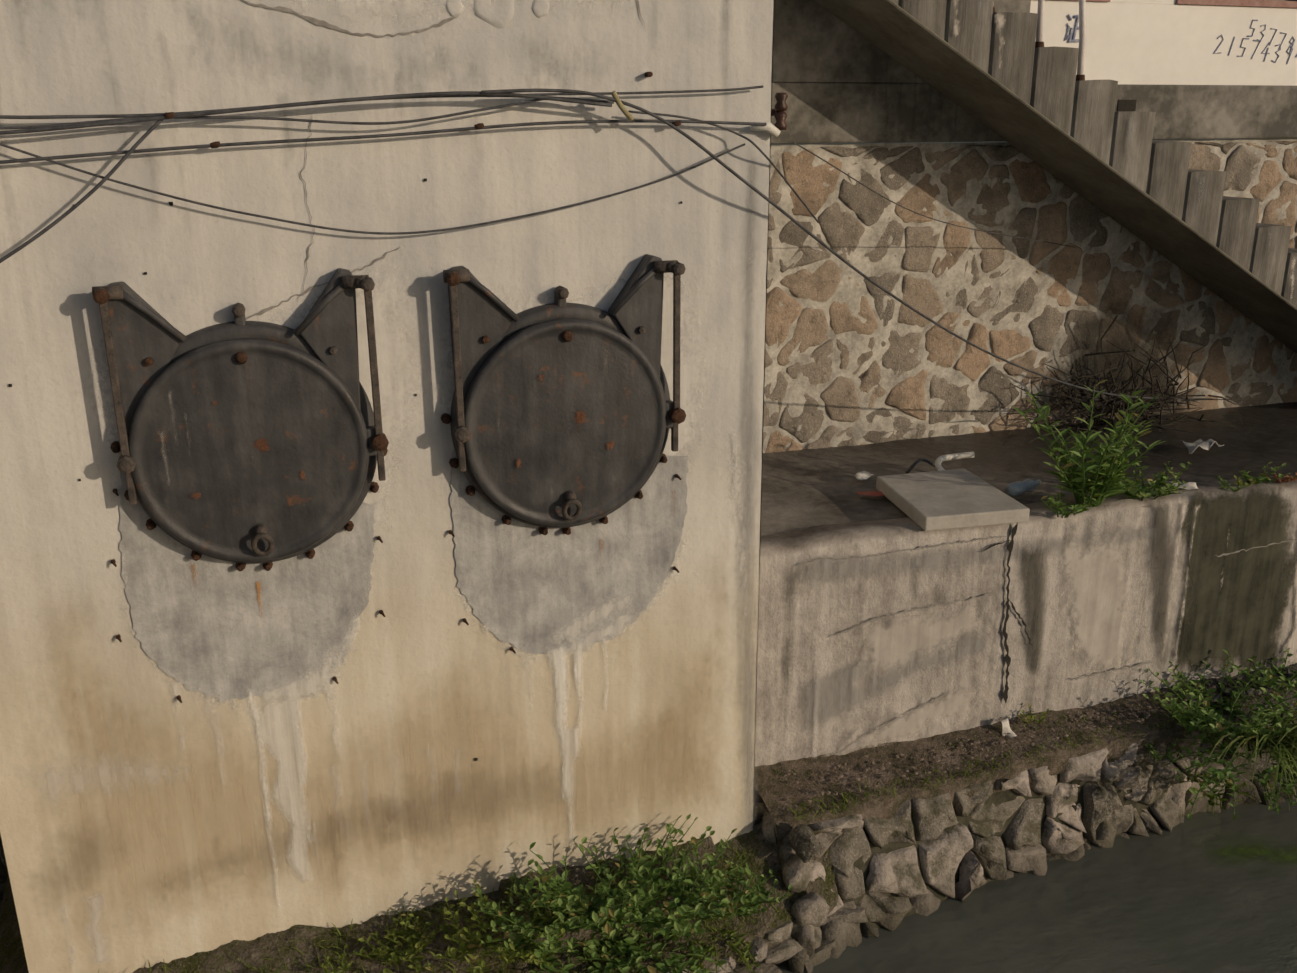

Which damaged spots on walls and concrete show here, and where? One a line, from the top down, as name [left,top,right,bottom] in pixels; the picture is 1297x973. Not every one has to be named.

leakage [249,682,309,880]
leakage [551,643,583,796]
crack [793,523,1033,703]
crack [1069,661,1155,680]